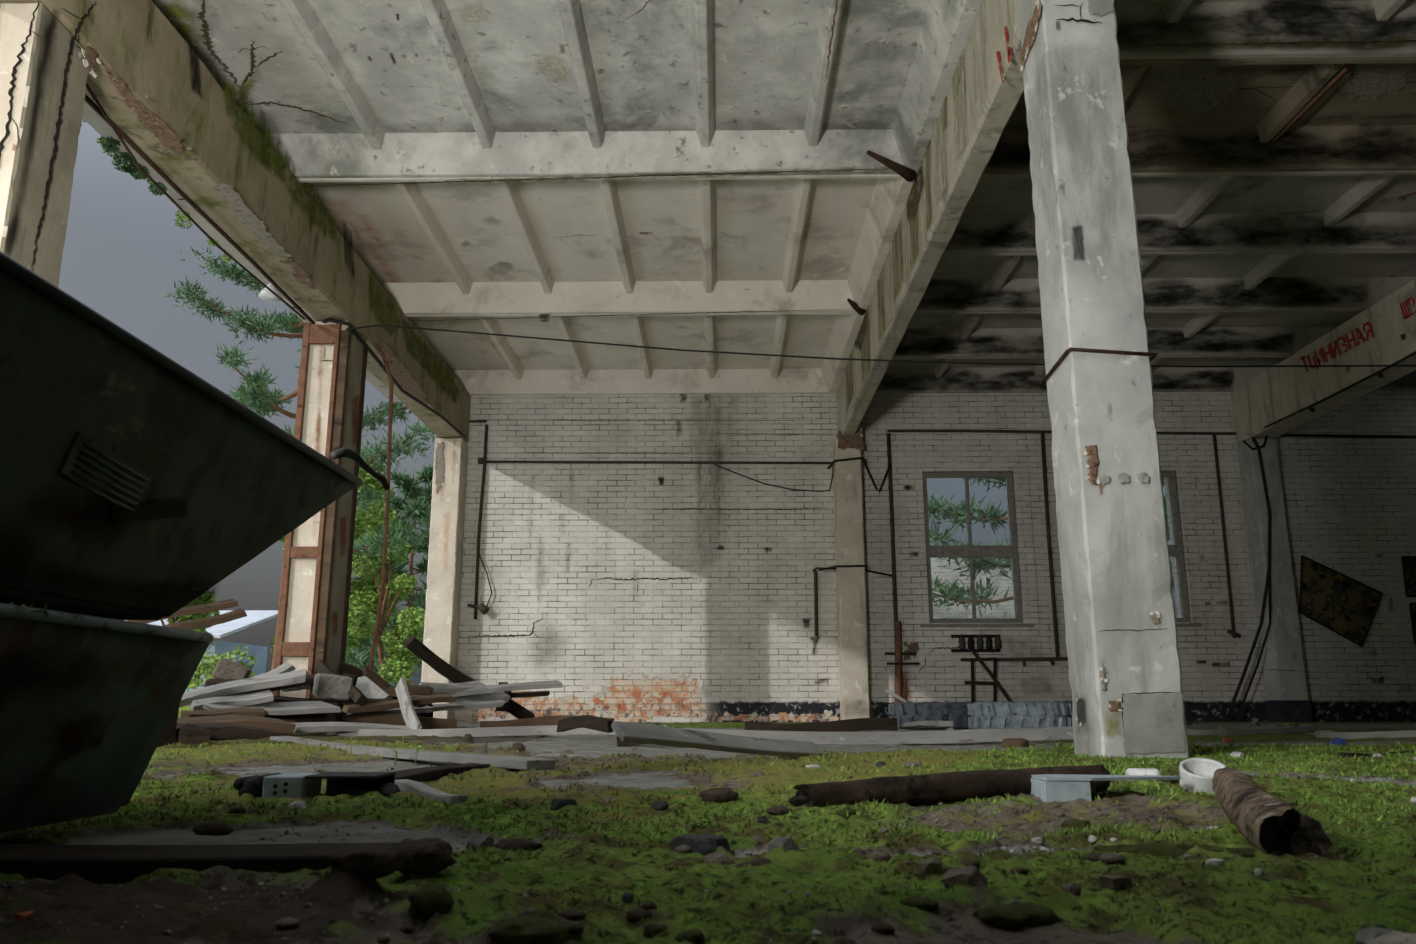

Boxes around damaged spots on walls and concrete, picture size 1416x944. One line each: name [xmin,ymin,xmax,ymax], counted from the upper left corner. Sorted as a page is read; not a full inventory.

crack [197,0,345,131]
crack [0,0,96,271]
peeling [216,184,316,297]
flaking render [472,670,839,723]